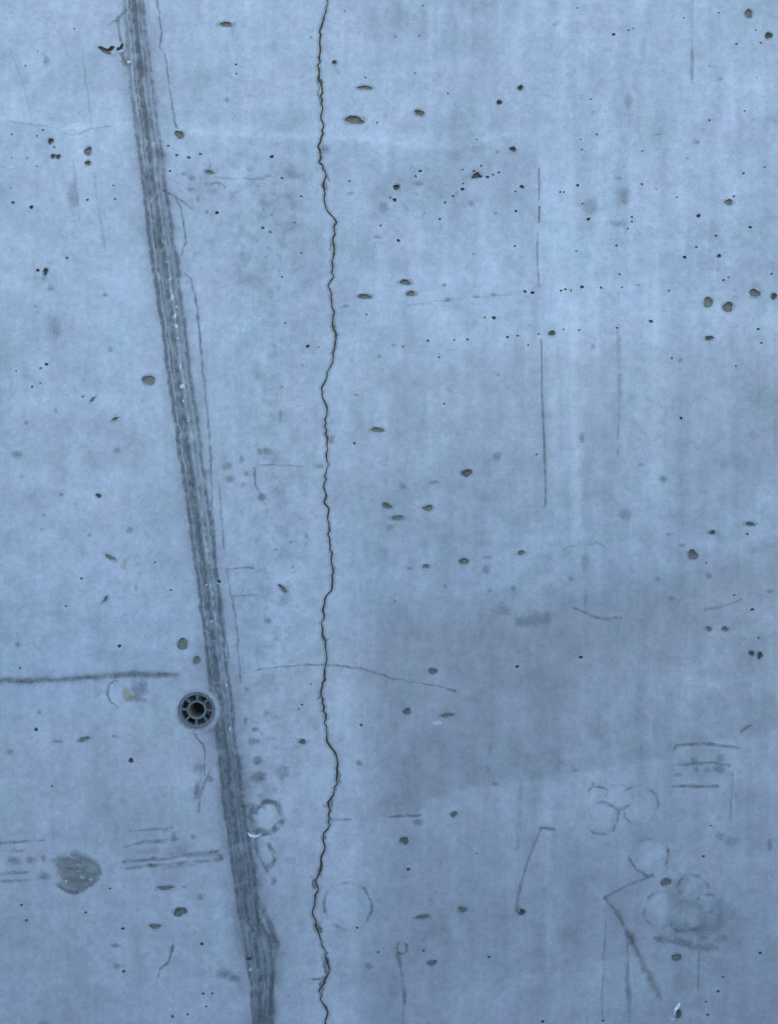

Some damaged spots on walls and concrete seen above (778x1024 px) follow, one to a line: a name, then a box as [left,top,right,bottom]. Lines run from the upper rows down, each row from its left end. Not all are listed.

crack [312,0,349,1024]